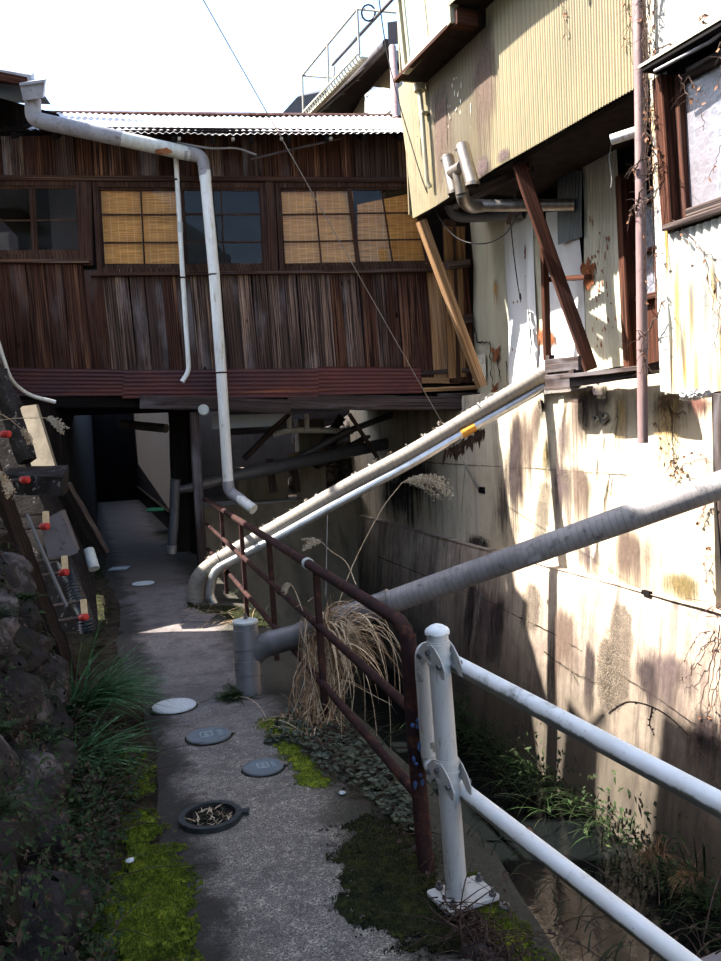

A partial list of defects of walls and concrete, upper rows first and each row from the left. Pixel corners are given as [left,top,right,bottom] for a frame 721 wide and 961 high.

damp [474,25,495,140]
rust [580,257,595,289]
rust [665,231,689,356]
damp [498,385,607,533]
damp [577,544,597,571]
damp [616,533,697,602]
damp [463,585,505,658]
damp [547,608,573,697]
damp [583,645,595,711]
damp [637,649,690,713]